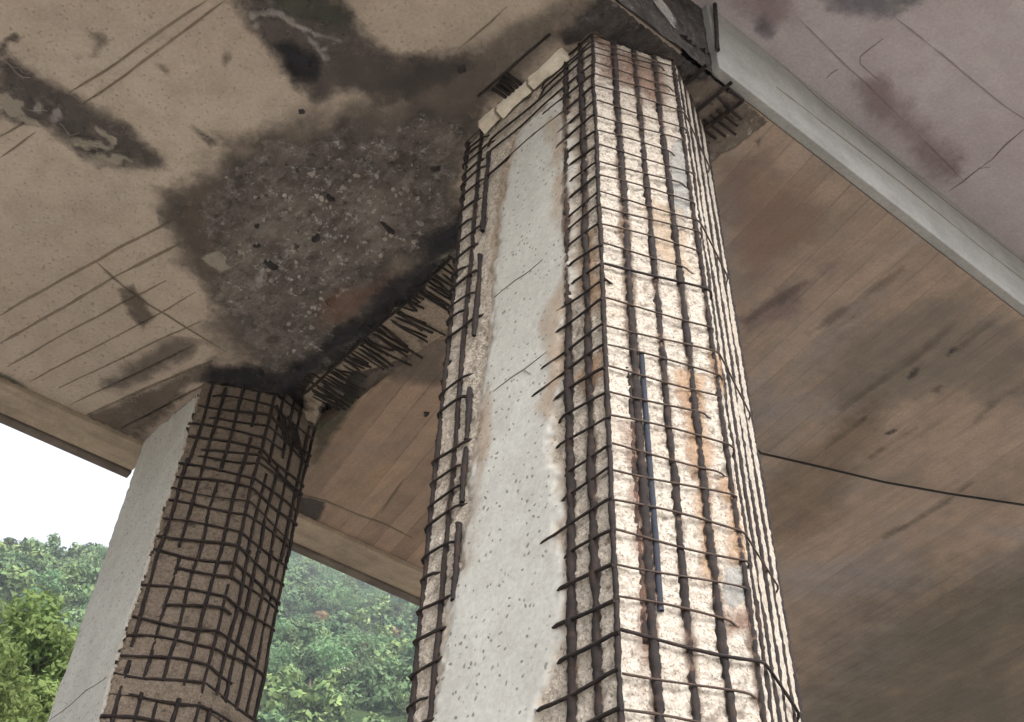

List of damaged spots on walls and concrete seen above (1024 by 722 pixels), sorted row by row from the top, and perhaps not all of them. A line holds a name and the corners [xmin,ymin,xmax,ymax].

damp [0,33,161,168]
damp [237,0,596,192]
corrosion [556,166,588,241]
corrosion [625,58,666,107]
corrosion [645,207,700,295]
crack [827,39,883,78]
crack [949,129,1024,191]
damp [89,311,294,441]
spalling [99,0,804,722]
corrosion [544,257,573,410]
corrosion [661,357,745,554]
corrosion [747,625,765,712]